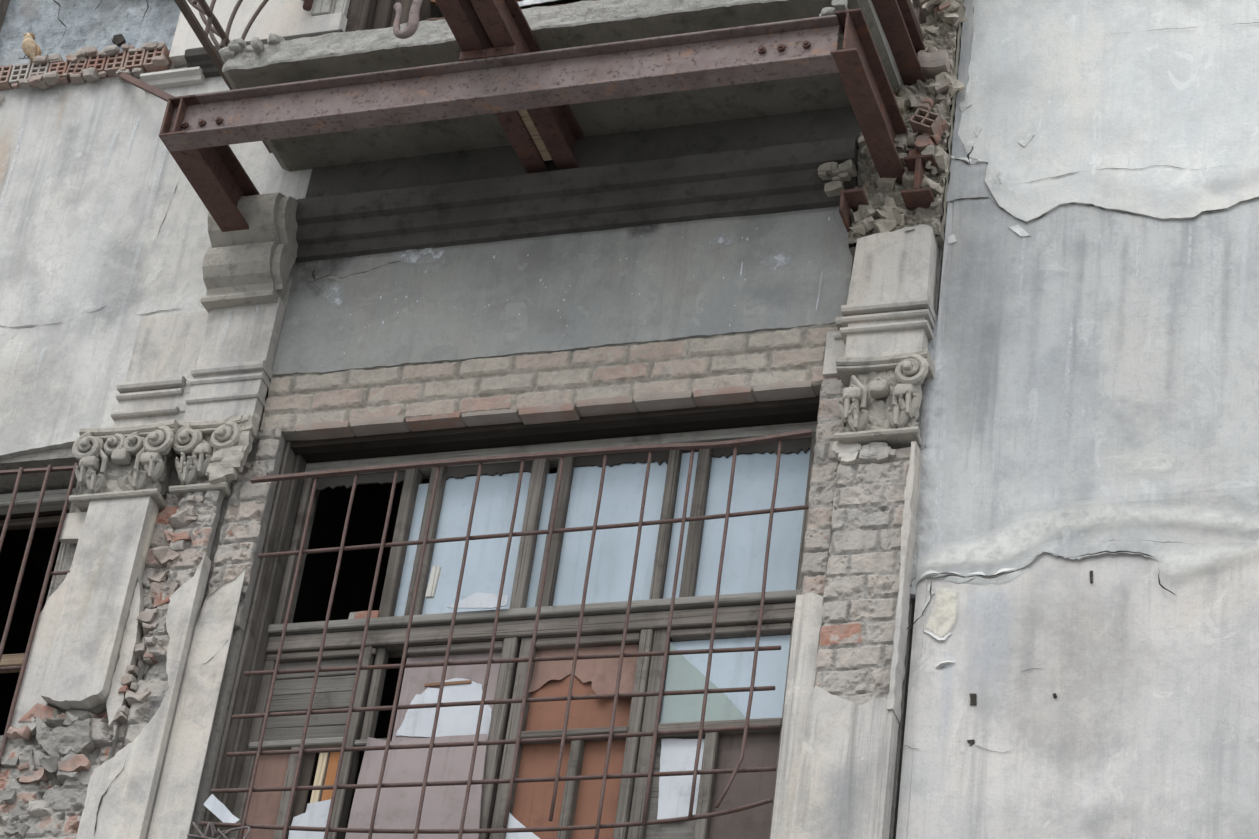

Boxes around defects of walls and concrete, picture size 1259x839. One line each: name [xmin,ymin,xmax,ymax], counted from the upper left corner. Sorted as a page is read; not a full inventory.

spalling [11,34,169,89]
spalling [818,0,982,257]
crack [950,146,986,167]
crack [946,165,1257,223]
flaking render [1009,225,1031,237]
crack [0,305,107,328]
crack [907,540,1256,629]
spalling [0,412,285,839]
flaking render [923,588,957,642]